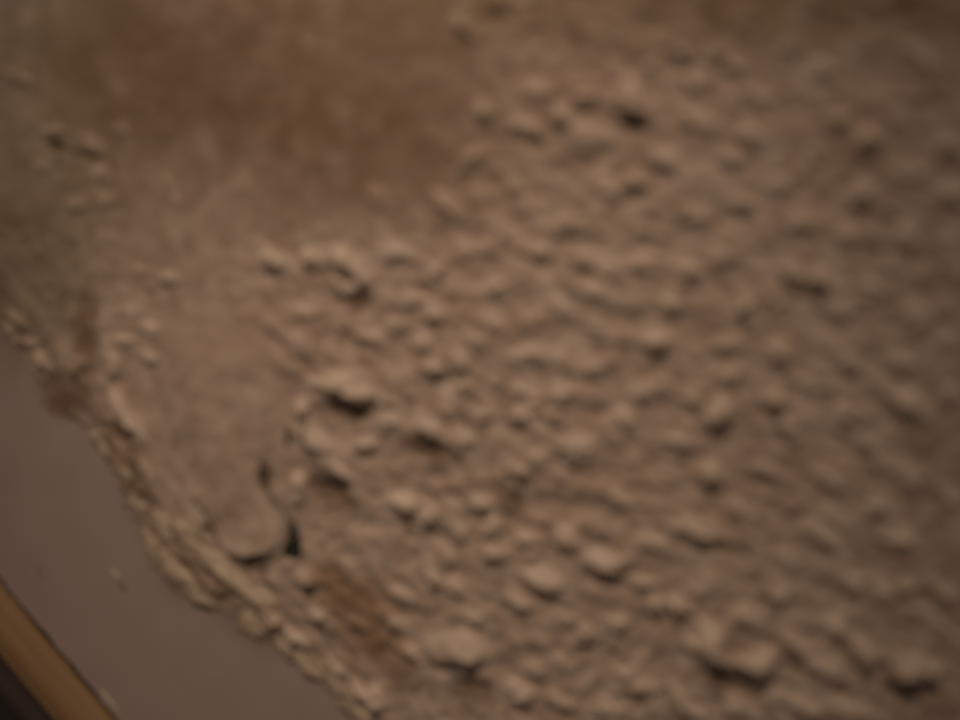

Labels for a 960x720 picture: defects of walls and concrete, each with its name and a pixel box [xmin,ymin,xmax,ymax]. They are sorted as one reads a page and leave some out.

spalling [281,518,303,560]
peeling [150,550,206,609]
peeling [187,540,266,610]
peeling [252,584,280,611]